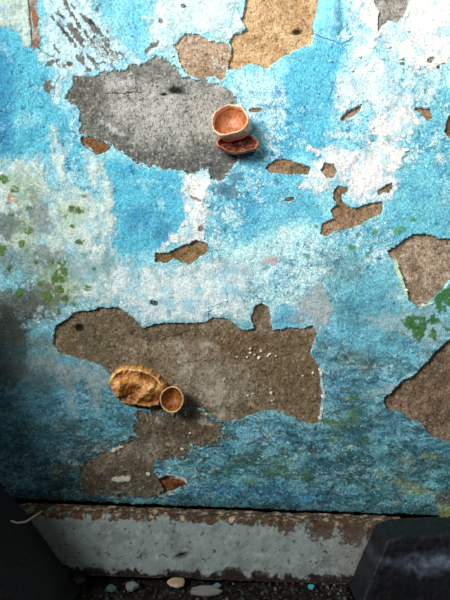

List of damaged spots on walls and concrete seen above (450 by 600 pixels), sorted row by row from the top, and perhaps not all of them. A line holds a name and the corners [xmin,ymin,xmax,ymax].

spalling [0,0,318,105]
spalling [81,136,111,155]
peeling [266,0,450,236]
water stain [0,125,118,305]
spalling [387,234,450,308]
spalling [54,171,334,501]
water stain [368,311,446,350]
spalling [384,339,450,442]
rust [19,503,393,552]